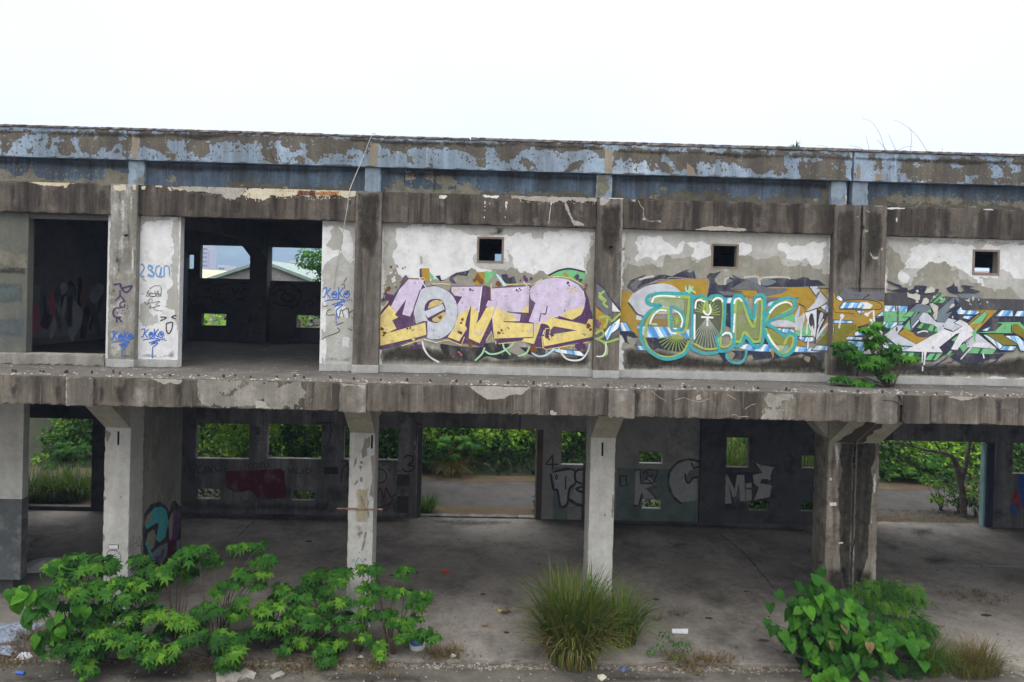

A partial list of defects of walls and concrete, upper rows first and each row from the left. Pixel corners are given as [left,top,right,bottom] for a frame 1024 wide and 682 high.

crack [549,201,584,226]
peeling [0,126,1024,379]
peeling [195,380,312,409]
spalling [470,385,530,400]
spalling [761,393,794,420]